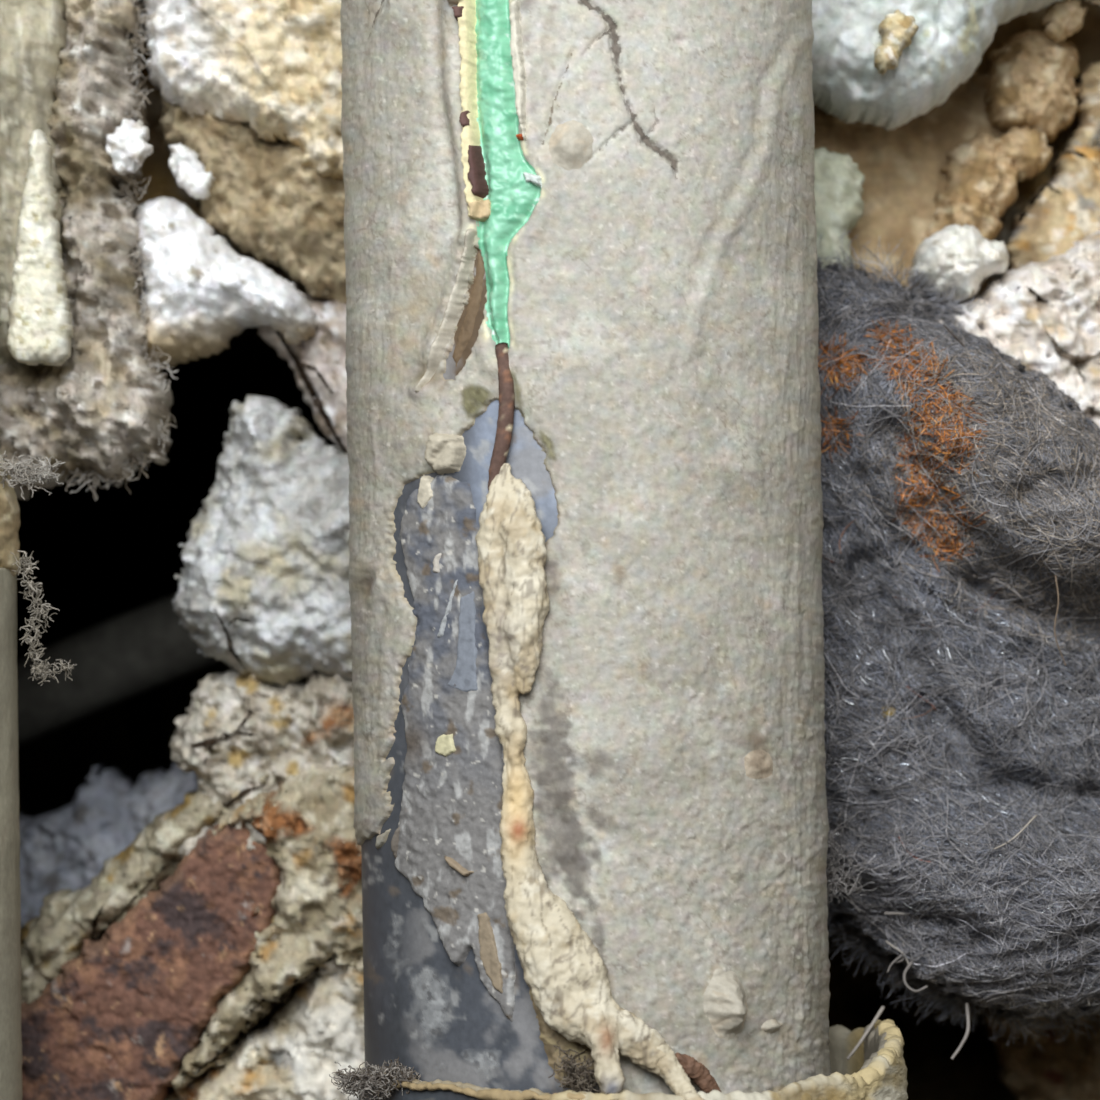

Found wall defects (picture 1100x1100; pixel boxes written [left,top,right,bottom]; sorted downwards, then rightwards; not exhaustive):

crack [580,0,678,171]
peeling [391,433,516,1022]